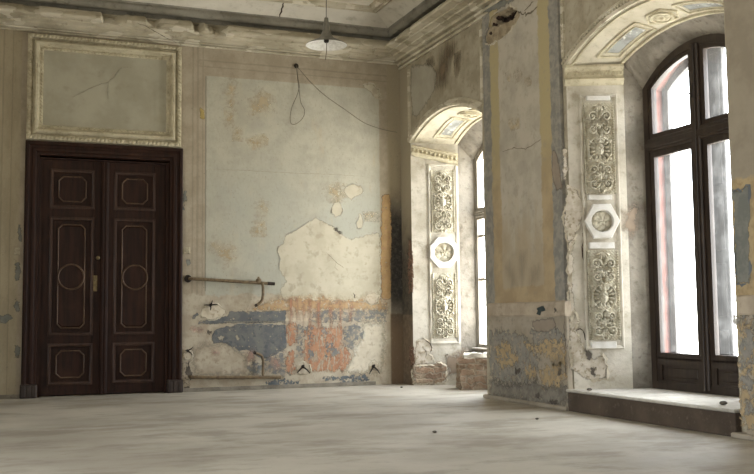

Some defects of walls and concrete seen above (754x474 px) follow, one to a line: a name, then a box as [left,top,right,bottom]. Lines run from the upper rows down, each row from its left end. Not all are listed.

spalling [483,0,520,46]
peeling [182,194,392,388]
peeling [489,149,610,406]
peeling [732,184,752,287]
flaking render [409,338,448,385]
peeling [733,315,754,429]